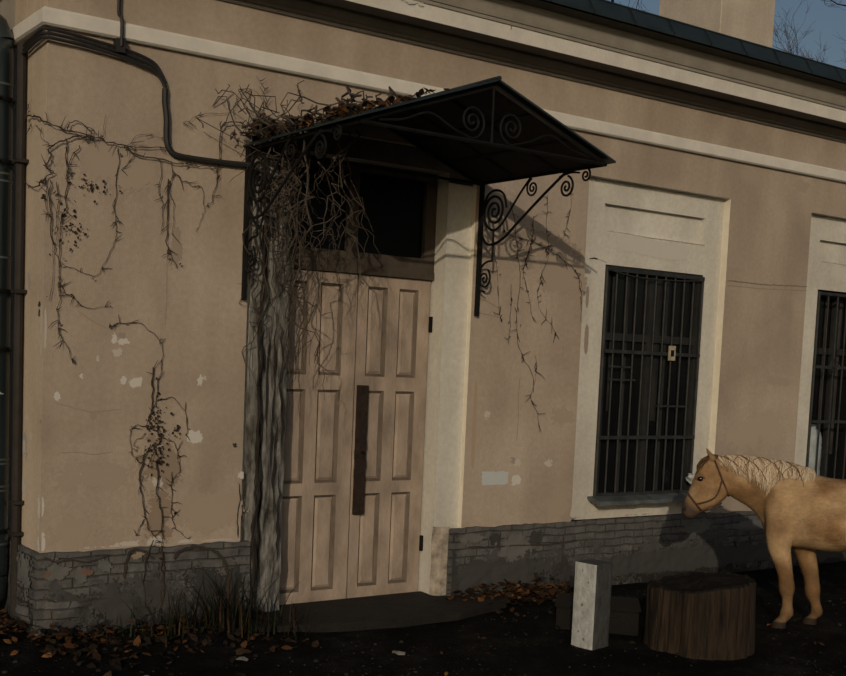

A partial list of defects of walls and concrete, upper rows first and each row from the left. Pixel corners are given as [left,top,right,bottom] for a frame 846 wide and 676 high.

flaking render [120,376,142,388]
flaking render [187,429,203,444]
flaking render [84,536,165,560]
peeling [459,532,533,563]
peeling [16,532,45,601]
peeling [43,558,113,585]